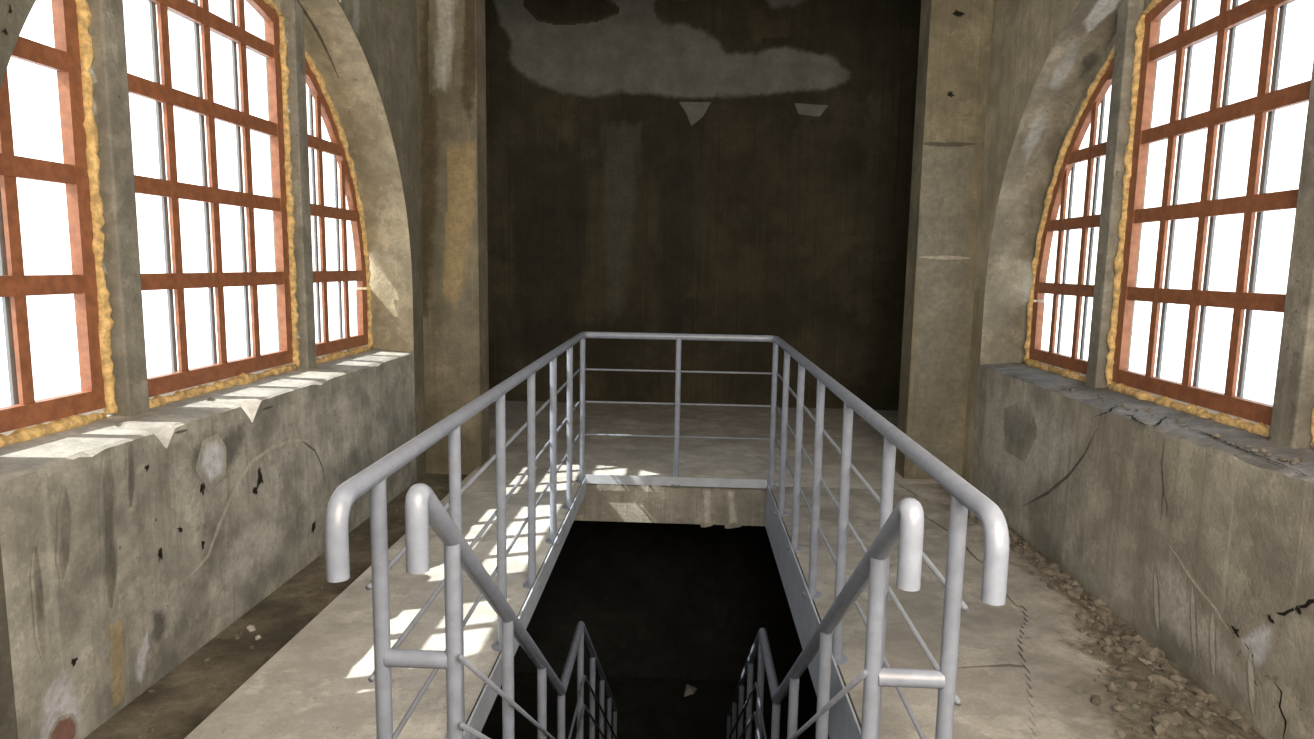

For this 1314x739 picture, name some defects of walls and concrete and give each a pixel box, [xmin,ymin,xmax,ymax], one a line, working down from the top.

peeling [485,0,859,126]
crack [1095,406,1314,738]
crack [959,662,1026,670]